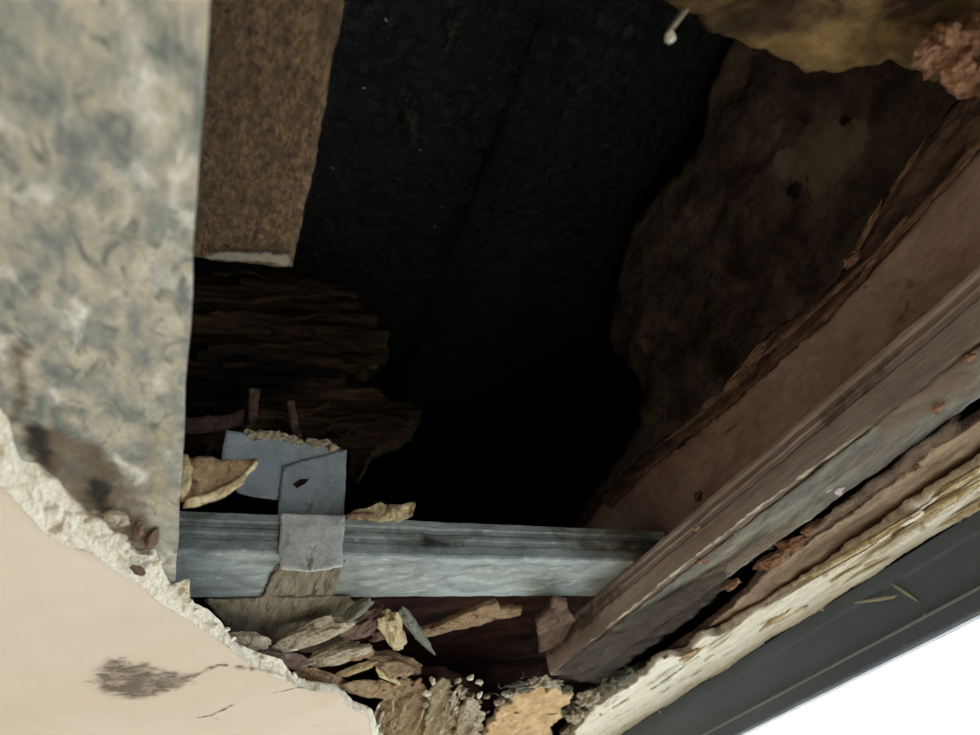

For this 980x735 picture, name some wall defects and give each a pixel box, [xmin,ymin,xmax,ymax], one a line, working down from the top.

leakage [26,426,152,556]
flaking render [0,408,383,735]
leakage [100,657,254,697]
peeling [376,666,401,685]